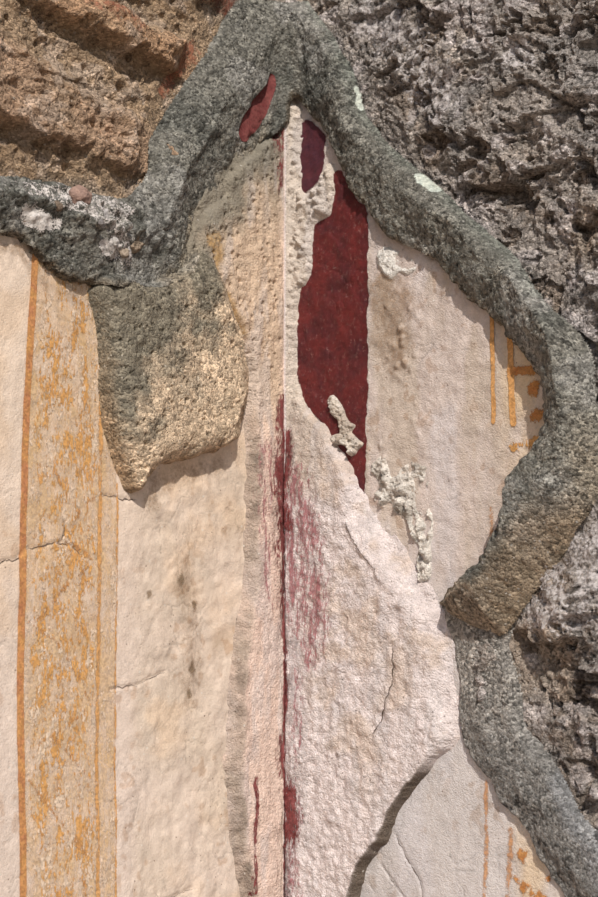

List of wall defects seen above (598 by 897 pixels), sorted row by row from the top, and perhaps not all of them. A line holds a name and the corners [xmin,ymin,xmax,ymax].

peeling [328,395,364,456]
crack [0,527,79,564]
spalling [371,456,434,583]
crack [372,647,394,734]